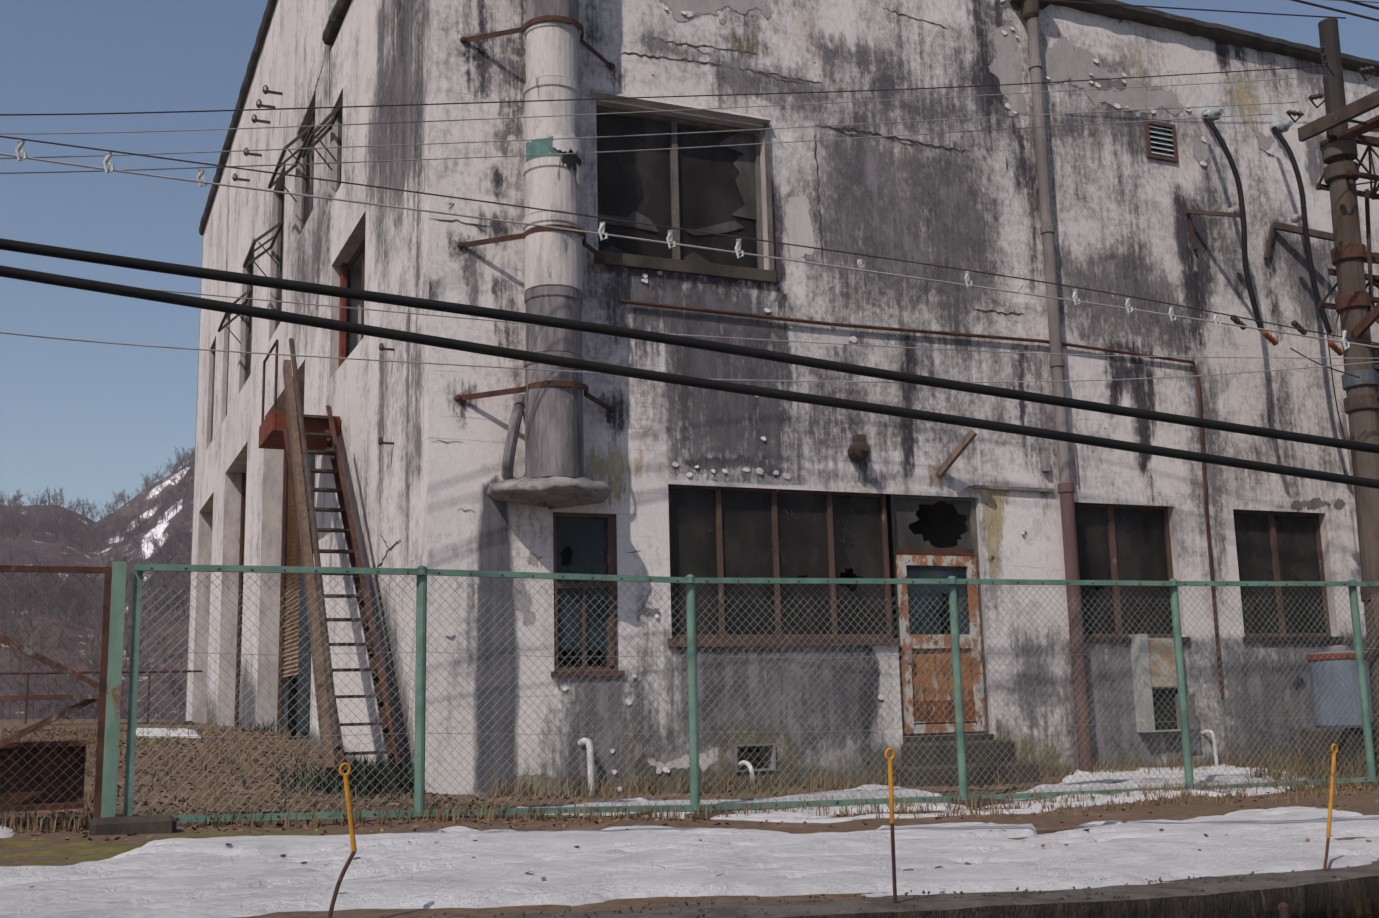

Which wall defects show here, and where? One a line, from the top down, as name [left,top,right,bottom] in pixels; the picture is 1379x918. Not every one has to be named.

peeling [659,0,782,24]
peeling [988,0,1027,116]
peeling [1040,32,1192,118]
damp [365,0,436,538]
damp [449,0,526,347]
damp [598,184,803,483]
damp [856,458,886,486]
damp [815,136,988,302]
damp [899,333,918,476]
damp [968,0,1227,602]
damp [474,476,519,794]